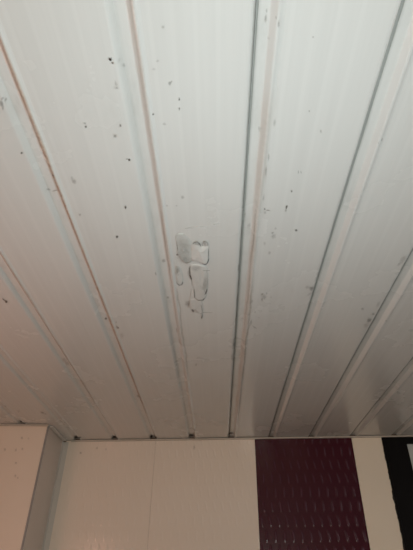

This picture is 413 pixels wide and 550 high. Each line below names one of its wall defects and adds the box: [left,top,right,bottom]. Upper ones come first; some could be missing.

peeling [174,231,211,320]